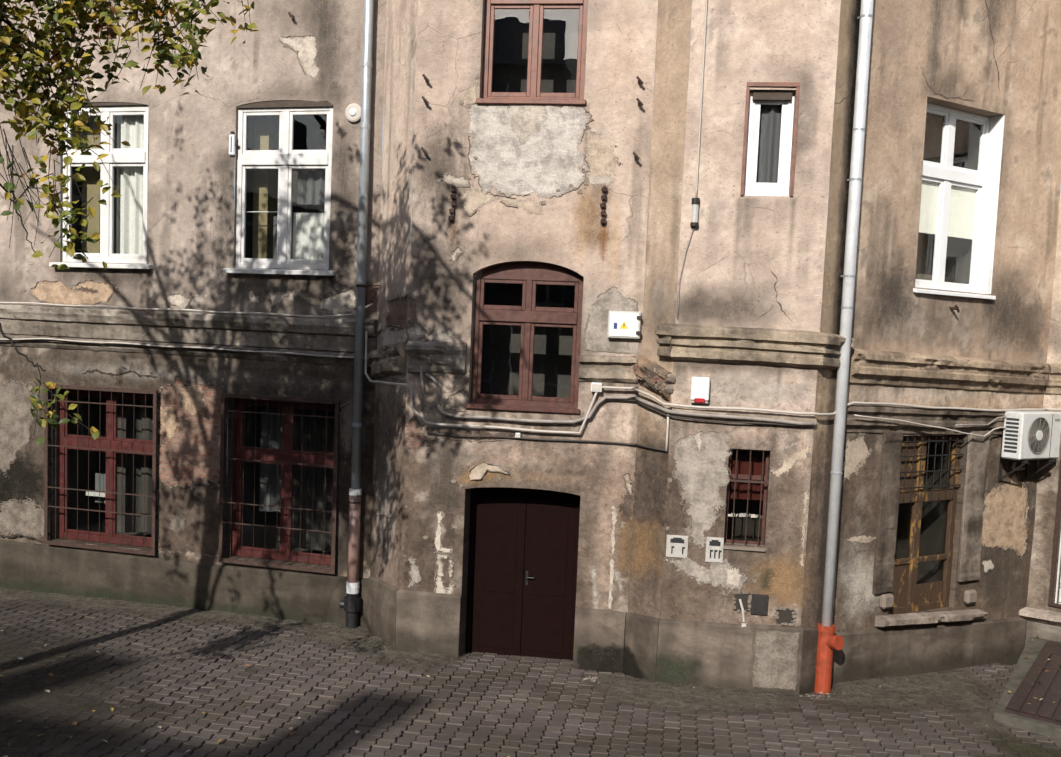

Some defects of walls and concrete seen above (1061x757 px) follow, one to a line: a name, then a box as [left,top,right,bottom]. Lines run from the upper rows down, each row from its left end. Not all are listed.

peeling [279,35,320,80]
crack [921,67,973,101]
crack [982,0,1000,91]
peeling [435,74,621,218]
spalling [23,279,118,305]
spalling [318,281,460,350]
peeling [0,380,36,477]
peeling [0,496,50,539]
spalling [152,378,227,557]
peeling [451,462,511,487]
peeling [592,430,800,690]
spalling [982,474,1030,572]